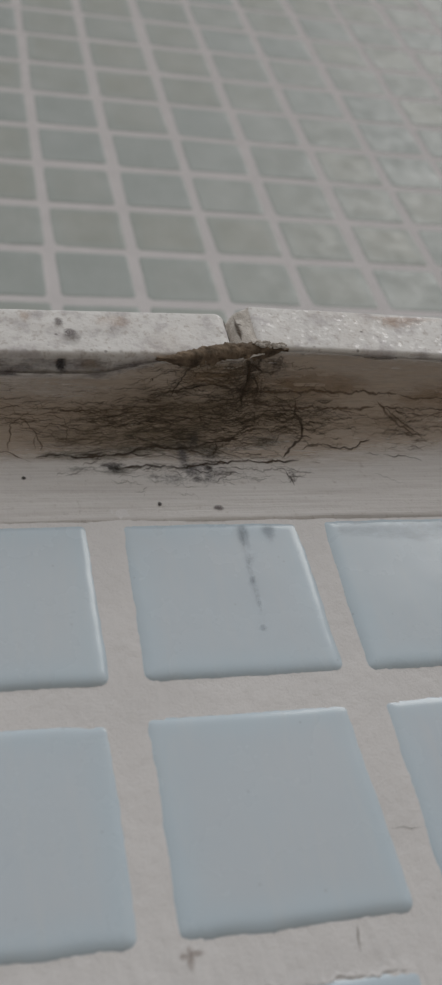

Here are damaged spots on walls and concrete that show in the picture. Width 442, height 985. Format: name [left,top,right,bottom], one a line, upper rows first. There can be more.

leakage [0,354,442,479]
crack [2,318,442,483]
spalling [252,340,288,355]